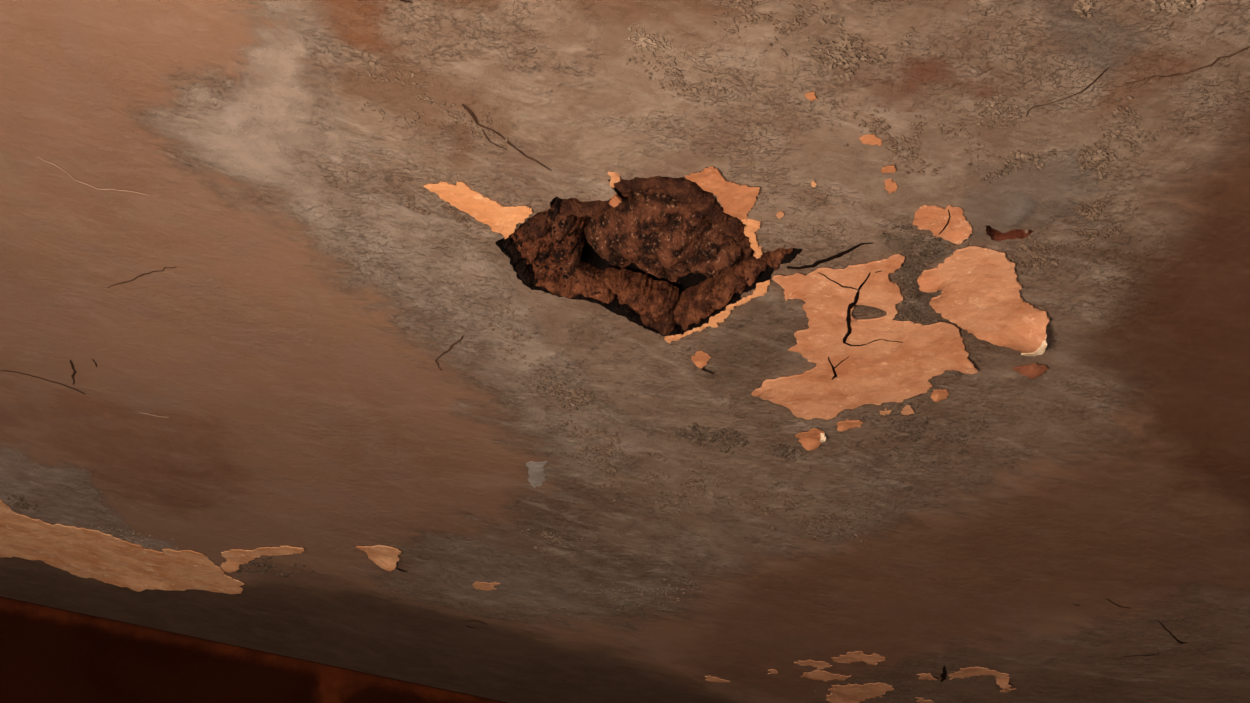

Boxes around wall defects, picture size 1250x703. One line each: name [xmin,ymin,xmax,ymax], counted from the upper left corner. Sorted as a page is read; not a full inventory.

crack [1026,46,1250,117]
crack [787,243,872,269]
leakage [148,0,1250,628]
spalling [405,166,1061,461]
leakage [0,448,170,549]
peeling [0,495,305,594]
peeling [356,545,401,572]
peeling [794,651,894,703]
peeling [916,667,1017,693]